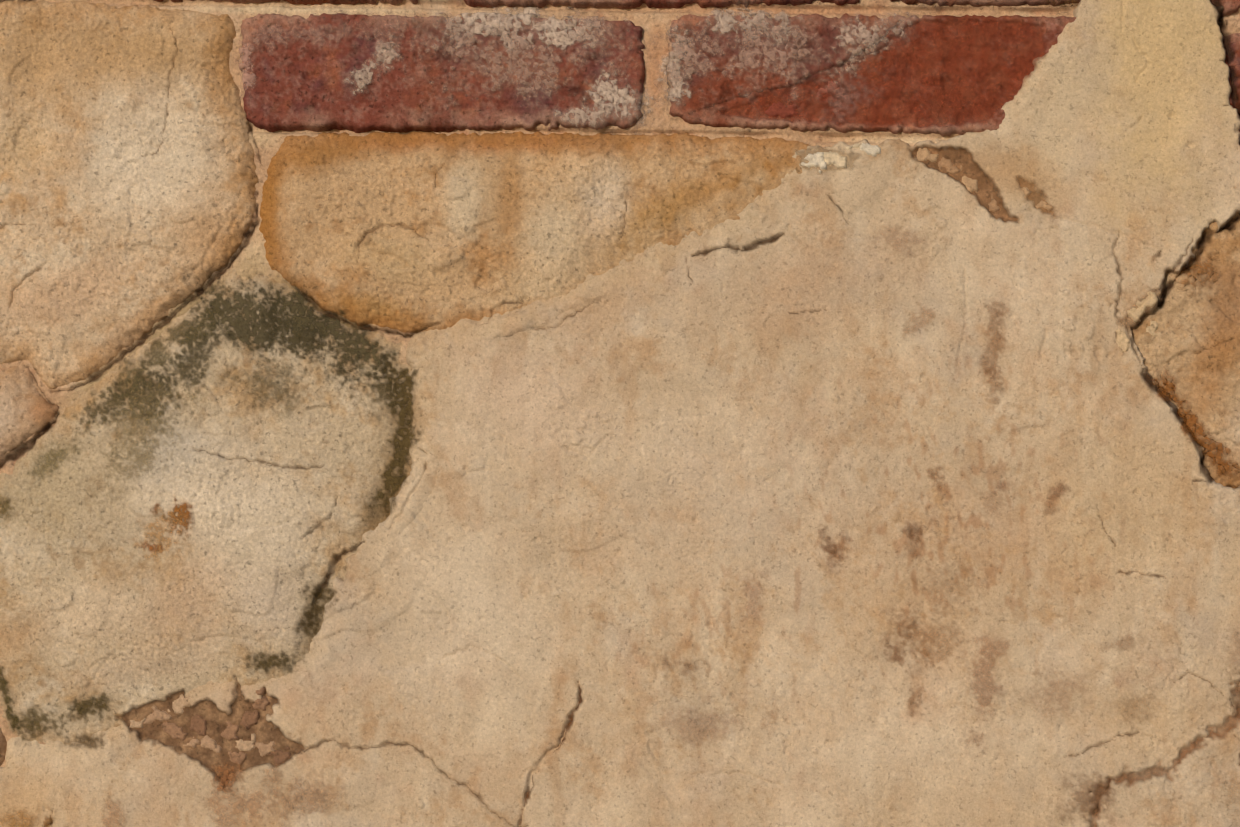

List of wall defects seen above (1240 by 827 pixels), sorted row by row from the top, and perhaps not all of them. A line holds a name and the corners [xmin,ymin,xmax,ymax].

efflorescence [347,26,398,93]
efflorescence [436,7,605,96]
efflorescence [556,70,653,127]
damp [658,8,821,101]
crack [1213,0,1240,118]
flaking render [796,143,881,174]
spalling [911,146,1018,223]
crack [692,235,782,257]
crack [1157,215,1240,307]
flaking render [1116,291,1158,352]
crack [1132,341,1231,487]
spalling [119,682,304,782]